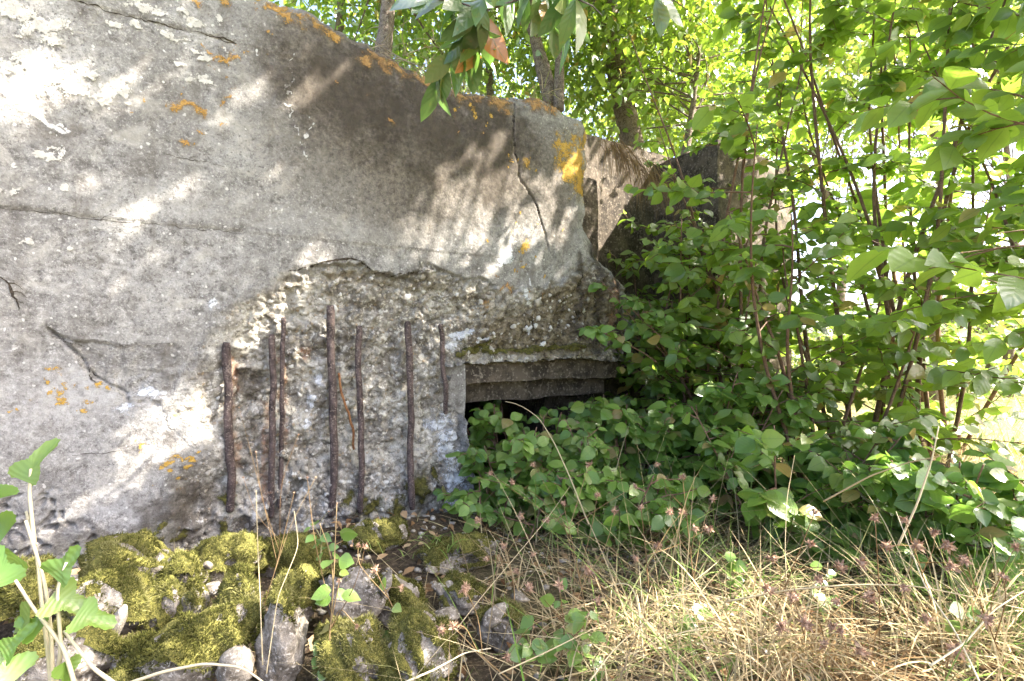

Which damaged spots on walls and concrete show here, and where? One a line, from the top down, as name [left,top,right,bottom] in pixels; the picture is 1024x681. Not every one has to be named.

crack [76,0,236,44]
peeling [496,248,514,267]
crack [505,113,553,235]
rust [222,342,236,513]
rust [268,317,286,518]
spalling [48,257,630,552]
rust [326,305,365,517]